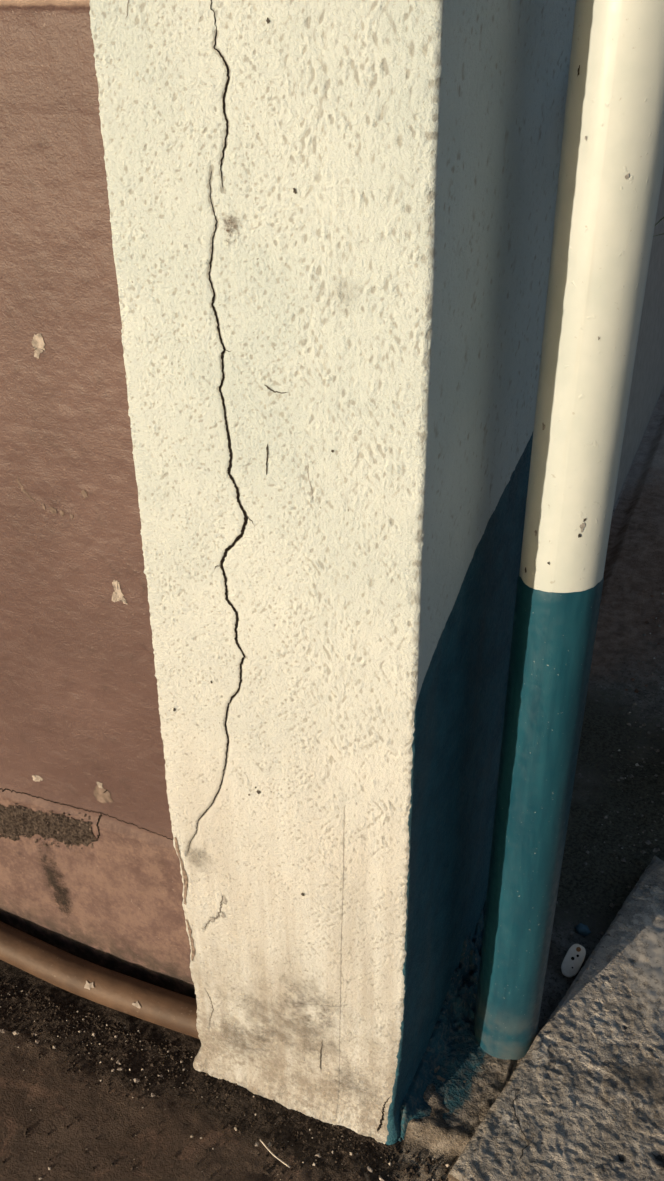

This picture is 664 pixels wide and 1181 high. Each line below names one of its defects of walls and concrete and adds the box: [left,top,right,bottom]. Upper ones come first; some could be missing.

peeling [31,334,45,359]
crack [0,0,253,854]
peeling [112,580,127,604]
spalling [0,803,97,849]